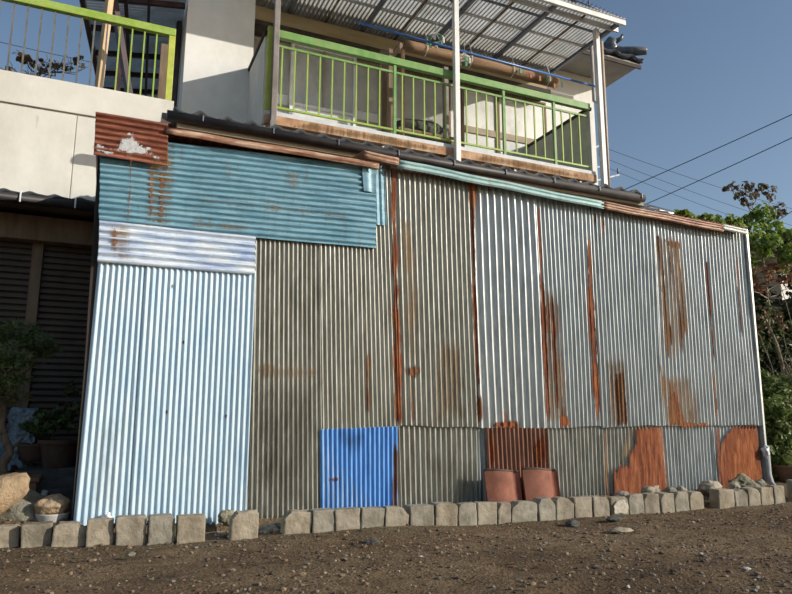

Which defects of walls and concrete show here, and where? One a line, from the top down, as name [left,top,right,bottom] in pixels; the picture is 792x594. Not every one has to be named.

peeling [96,133,159,159]
corrosion [391,173,420,425]
corrosion [468,183,483,423]
corrosion [538,207,572,428]
corrosion [587,239,600,420]
corrosion [656,236,687,356]
corrosion [706,263,714,354]
corrosion [489,412,519,466]
corrosion [604,366,763,496]